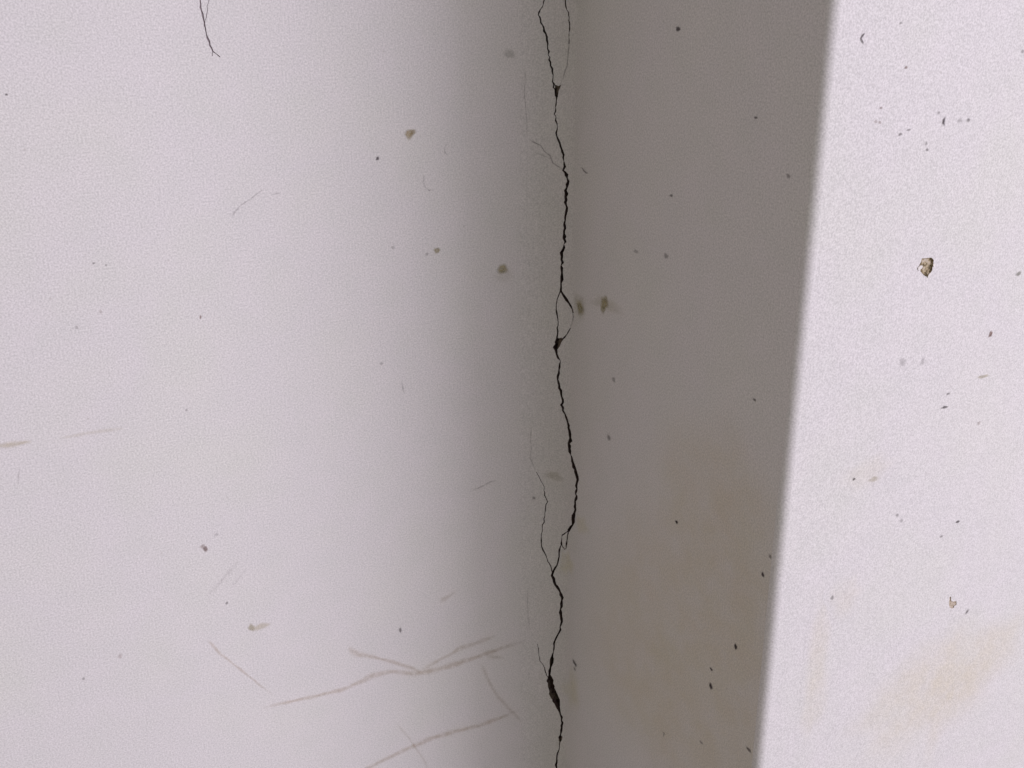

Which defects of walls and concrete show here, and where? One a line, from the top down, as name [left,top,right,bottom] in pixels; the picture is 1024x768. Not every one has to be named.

crack [199,0,220,57]
crack [534,0,579,768]